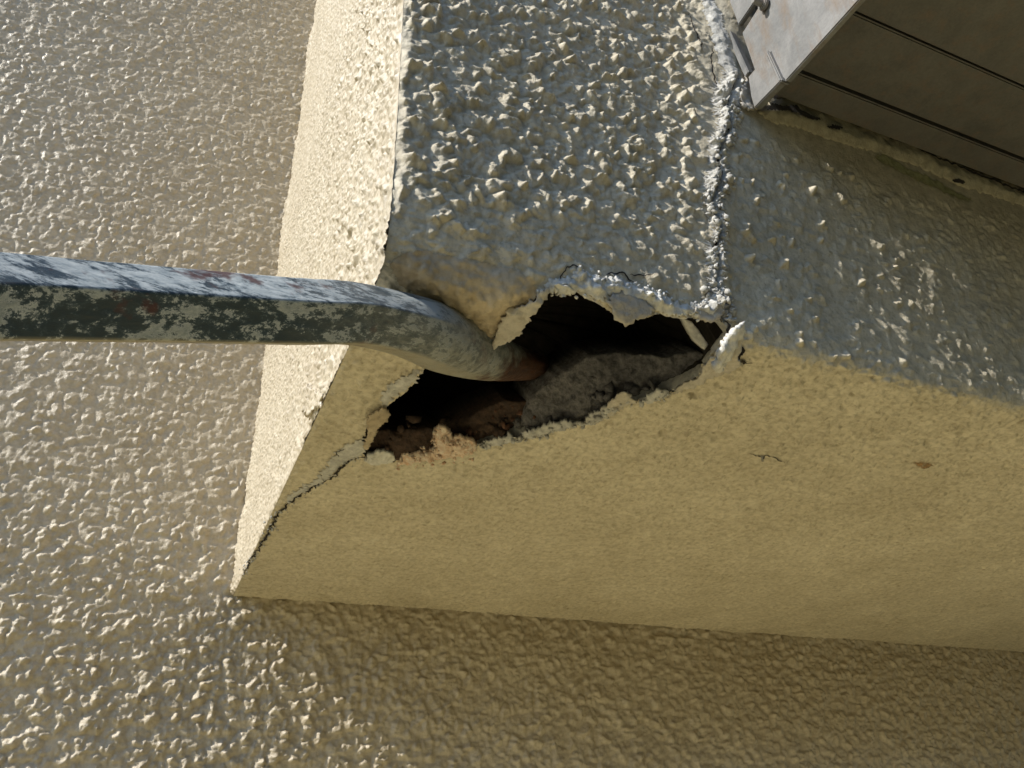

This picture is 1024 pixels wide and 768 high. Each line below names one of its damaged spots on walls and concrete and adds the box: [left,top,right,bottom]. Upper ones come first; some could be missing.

crack [690,0,749,364]
spalling [287,265,747,501]
crack [239,449,367,575]